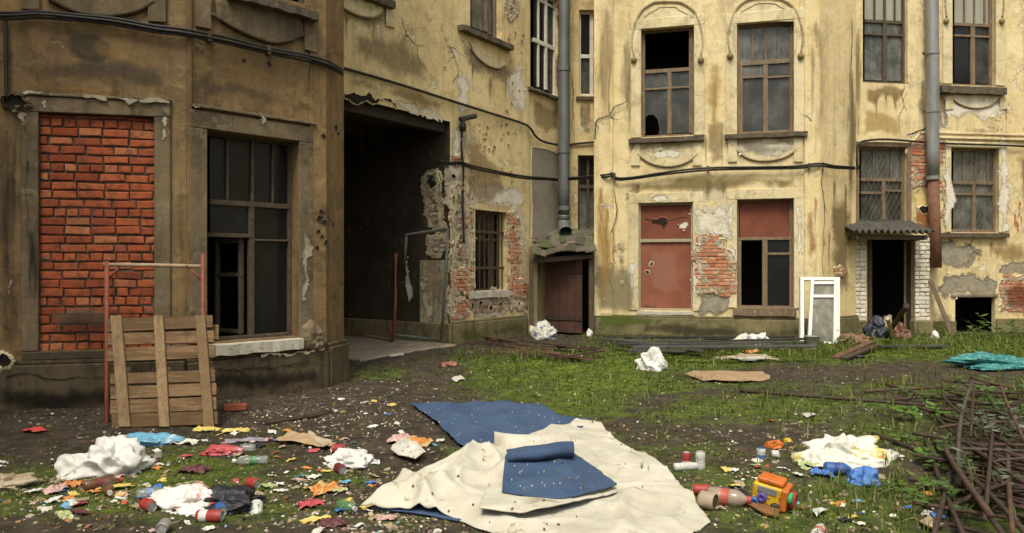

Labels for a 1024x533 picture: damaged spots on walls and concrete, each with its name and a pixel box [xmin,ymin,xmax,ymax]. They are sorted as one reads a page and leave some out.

spalling [0,88,52,126]
spalling [83,94,170,105]
crack [571,76,628,141]
damp [851,27,902,112]
flaking render [344,0,559,321]
peeling [944,97,1011,232]
spalling [301,209,335,301]
flaking render [677,200,737,315]
spalling [905,130,1024,315]